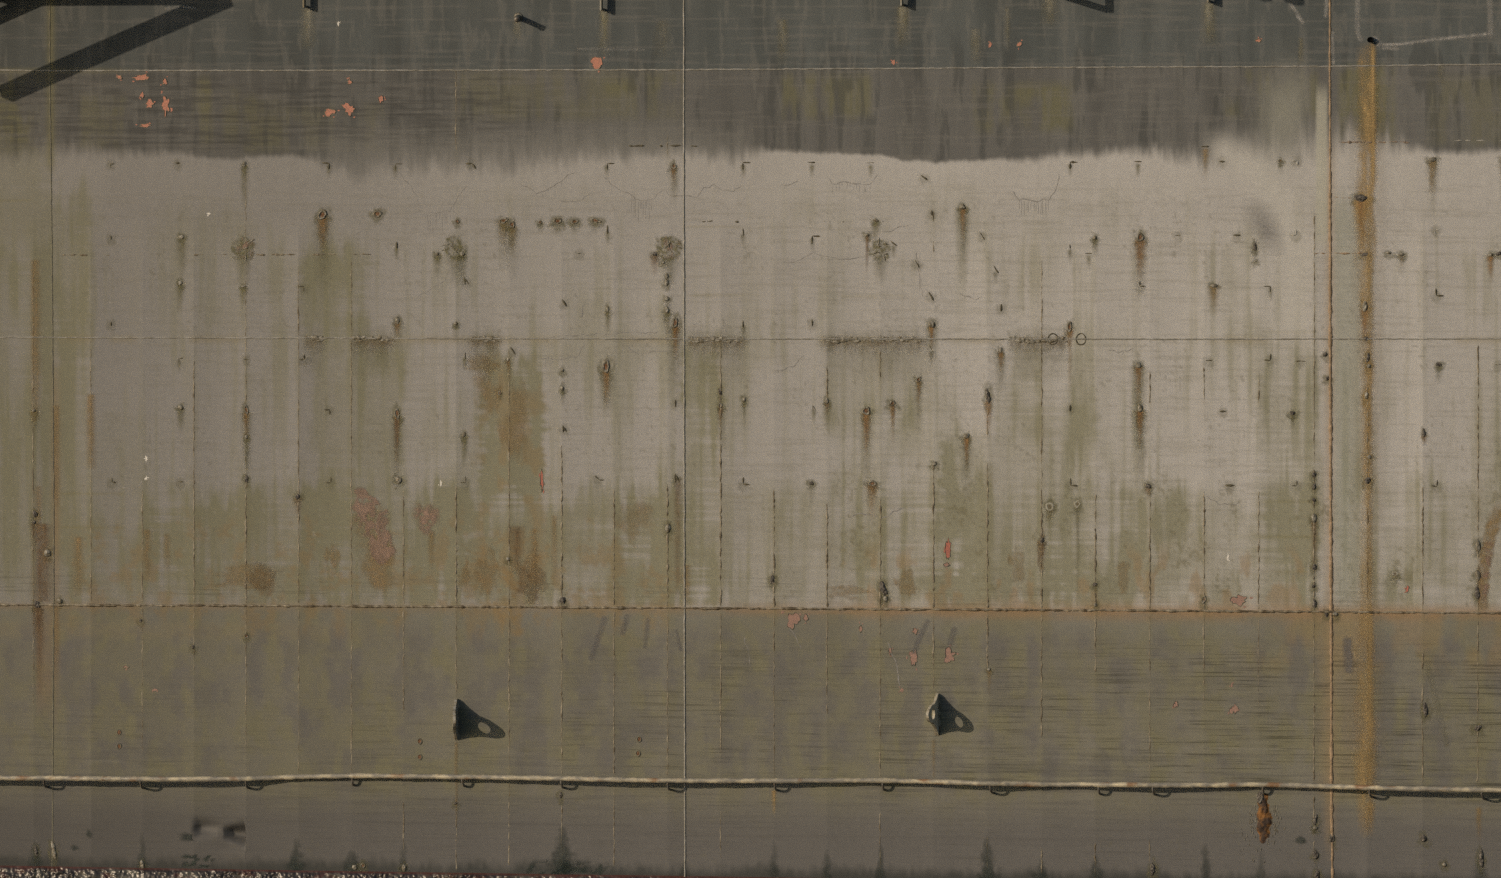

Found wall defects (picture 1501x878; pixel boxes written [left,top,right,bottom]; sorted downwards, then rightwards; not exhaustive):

peeling [116,71,173,128]
peeling [323,103,355,118]
corrosion [1354,48,1374,225]
corrosion [1475,511,1501,606]
corrosion [1233,791,1285,869]